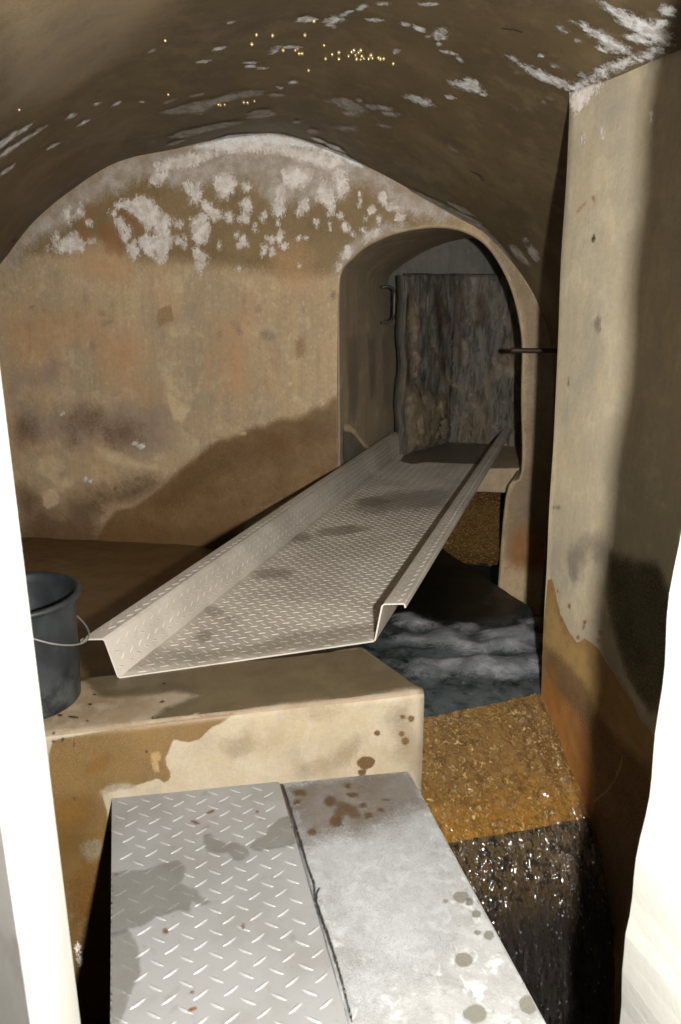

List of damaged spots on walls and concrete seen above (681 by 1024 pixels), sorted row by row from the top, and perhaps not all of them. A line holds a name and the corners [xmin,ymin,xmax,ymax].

damp [295,2,389,29]
damp [244,45,302,70]
damp [400,22,464,63]
damp [507,0,677,118]
damp [0,77,554,569]
damp [565,526,670,720]
peeling [146,750,161,773]